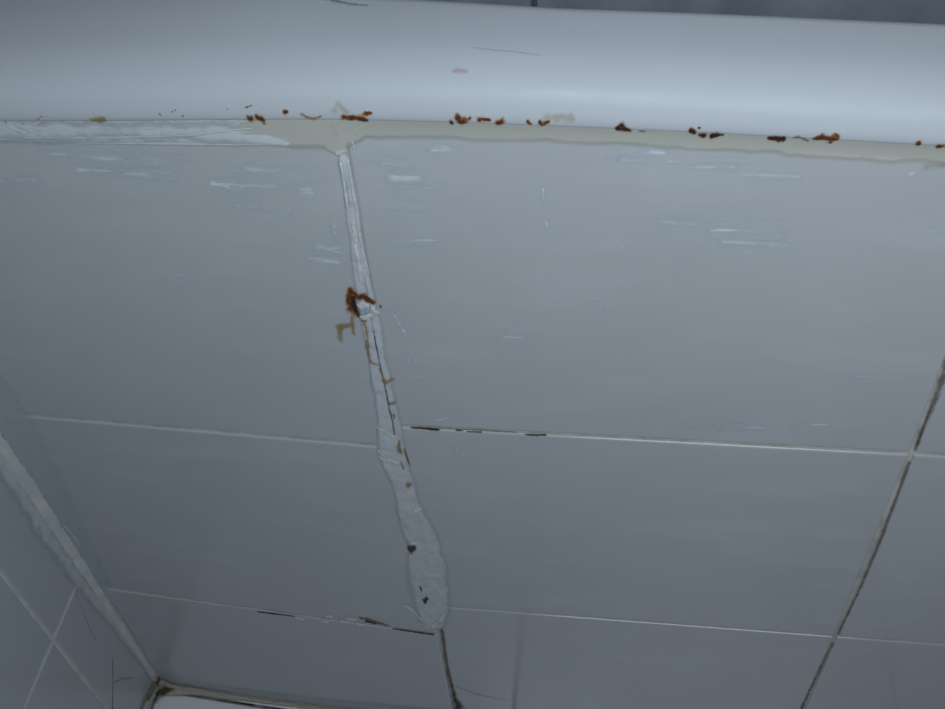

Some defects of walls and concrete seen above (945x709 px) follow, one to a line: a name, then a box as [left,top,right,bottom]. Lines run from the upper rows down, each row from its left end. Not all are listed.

corrosion [341,111,372,122]
corrosion [450,113,504,125]
corrosion [689,127,724,139]
corrosion [767,133,840,144]
corrosion [337,287,394,384]
crack [373,331,410,465]
crack [393,627,434,635]